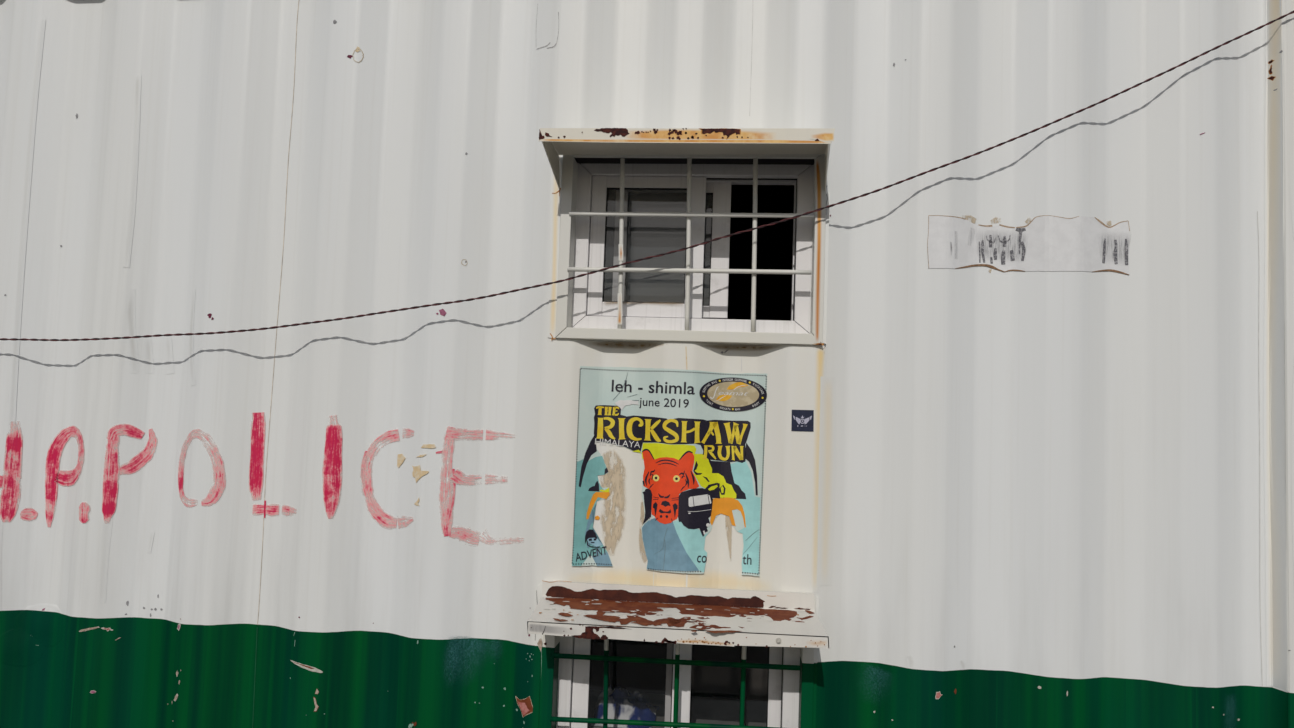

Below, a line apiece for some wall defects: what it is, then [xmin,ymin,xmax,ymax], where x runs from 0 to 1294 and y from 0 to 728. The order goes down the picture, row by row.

peeling [397,444,436,482]
corrosion [539,128,836,592]
corrosion [1264,0,1294,691]
peeling [515,696,533,717]